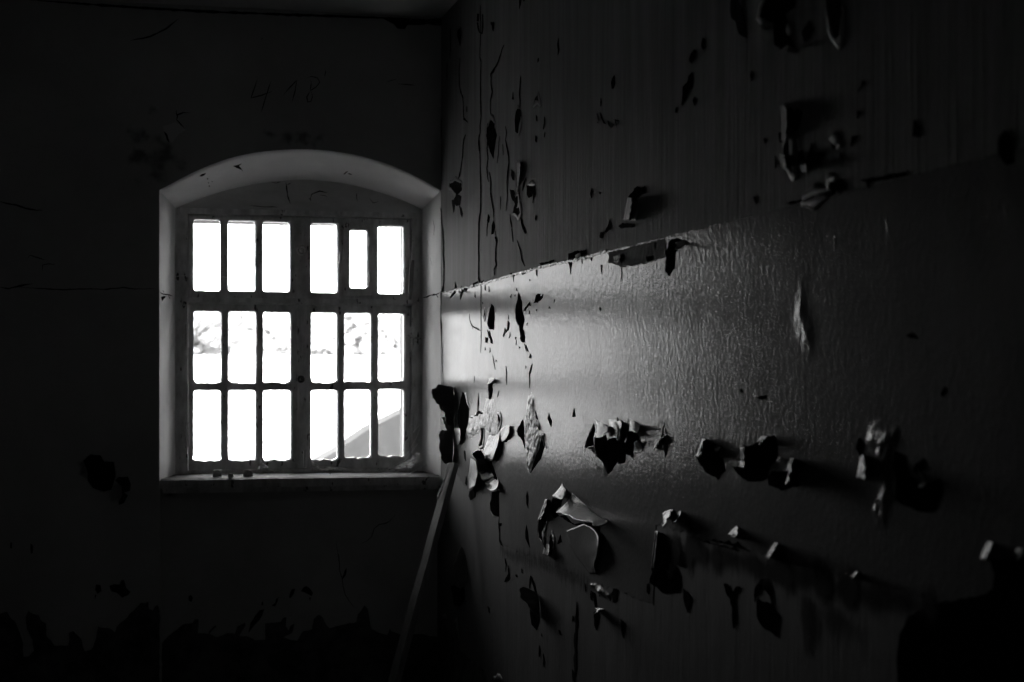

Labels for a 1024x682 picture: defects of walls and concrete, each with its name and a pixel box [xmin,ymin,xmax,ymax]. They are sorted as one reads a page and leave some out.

peeling [730,0,798,53]
peeling [486,114,497,159]
peeling [764,103,858,211]
peeling [449,176,463,216]
peeling [510,161,537,221]
peeling [431,186,685,517]
peeling [696,435,801,491]
peeling [856,455,866,480]
peeling [525,484,608,574]
peeling [646,509,692,613]
peeling [519,587,540,629]
peeling [590,588,618,629]